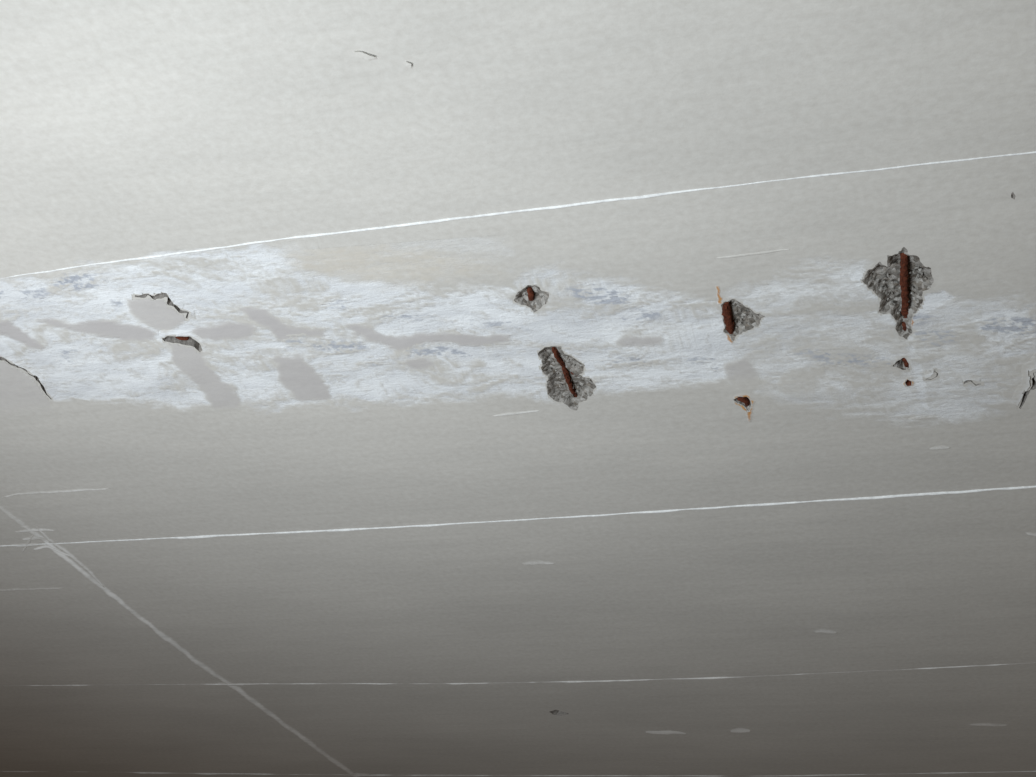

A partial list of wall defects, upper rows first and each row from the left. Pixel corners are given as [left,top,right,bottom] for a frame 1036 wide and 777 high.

peeling [0,286,334,414]
leakage [0,234,1036,438]
spalling [514,285,550,312]
spalling [538,346,596,410]
spalling [715,286,765,344]
peeling [723,355,763,423]
spalling [862,247,934,339]